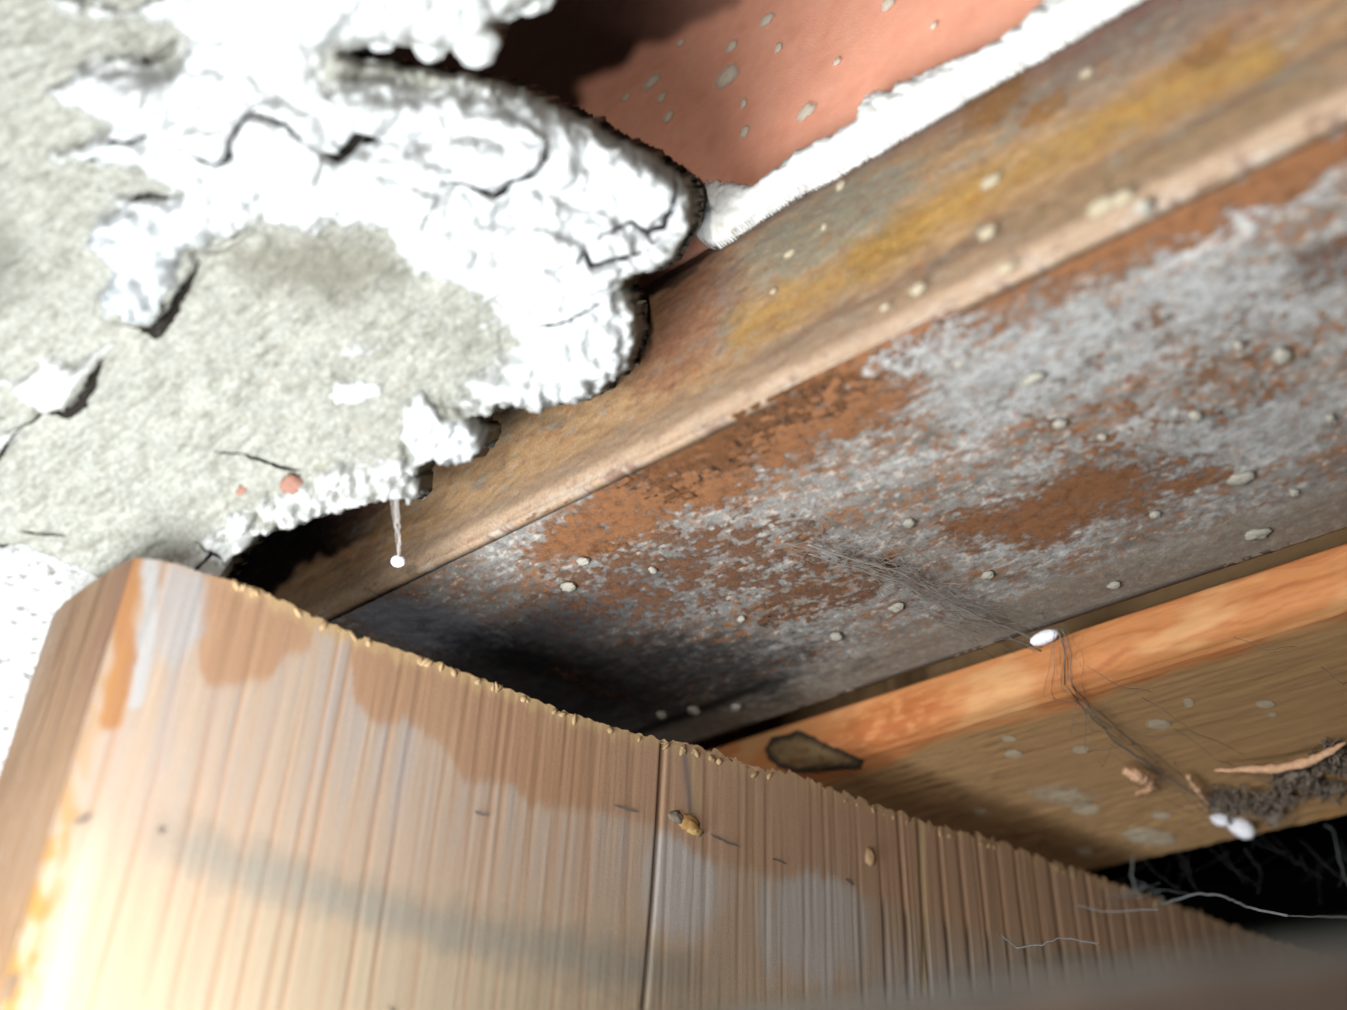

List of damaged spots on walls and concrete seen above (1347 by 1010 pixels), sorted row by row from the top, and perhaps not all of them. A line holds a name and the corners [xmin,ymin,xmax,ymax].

corrosion [965,75,1056,128]
corrosion [516,127,1347,637]
spalling [280,473,303,494]
leakage [454,634,805,712]